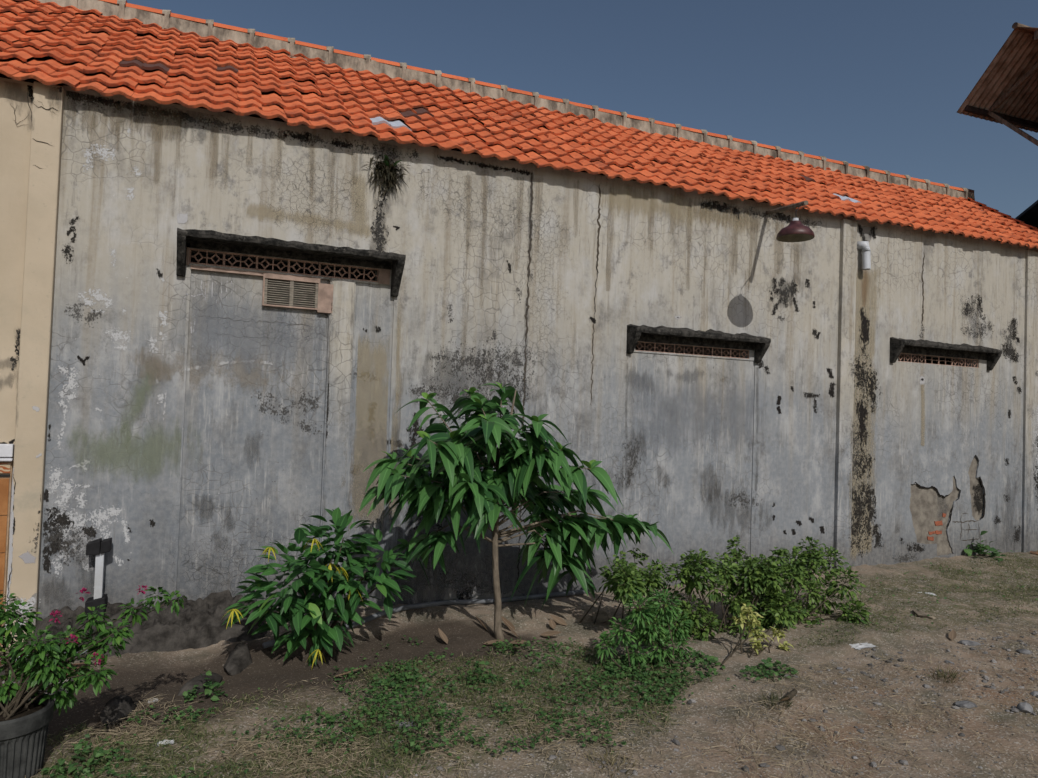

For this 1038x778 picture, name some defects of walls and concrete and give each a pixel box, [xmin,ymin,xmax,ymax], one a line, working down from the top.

leakage [370,185,390,253]
crack [591,185,601,401]
leakage [769,278,810,321]
leakage [251,383,329,438]
leakage [351,329,537,516]
leakage [849,307,884,557]
spalling [5,467,41,630]
leakage [893,538,925,563]
flaking render [909,455,986,556]